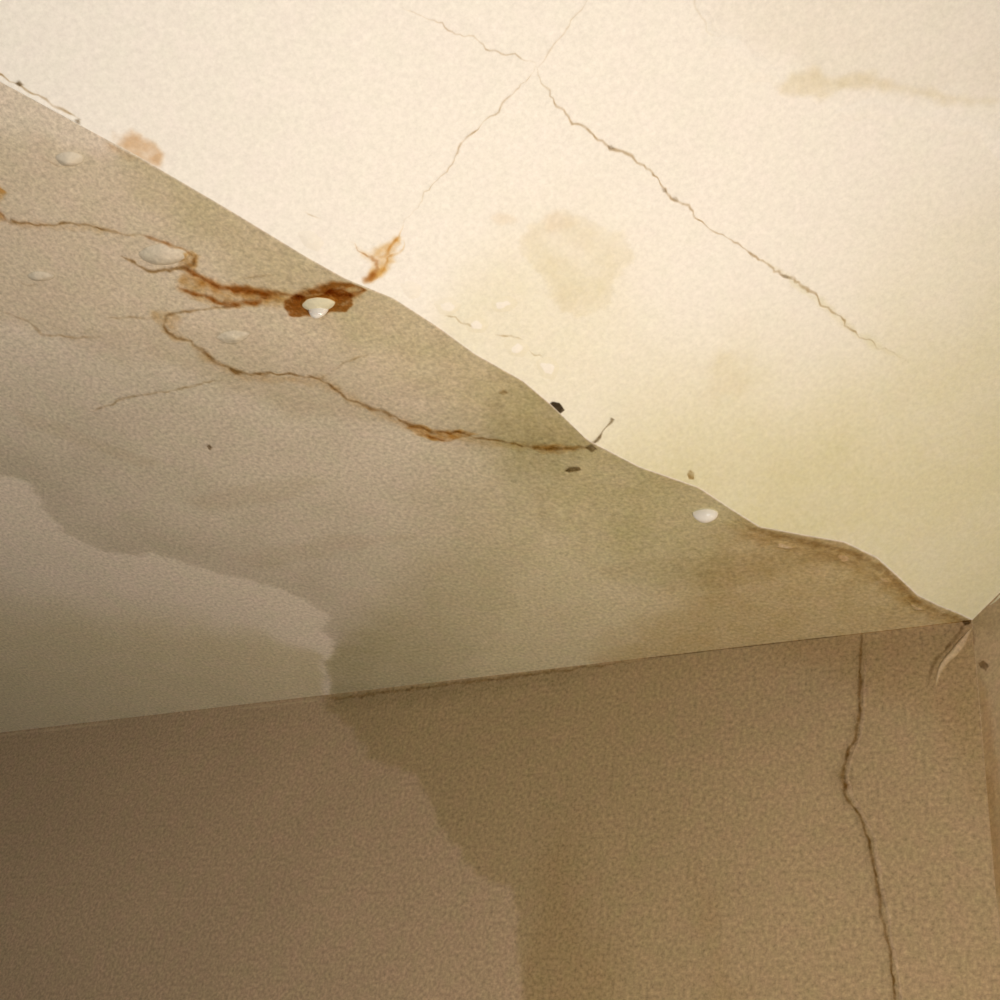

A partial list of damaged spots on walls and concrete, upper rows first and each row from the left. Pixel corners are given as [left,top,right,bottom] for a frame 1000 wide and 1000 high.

crack [187,273,269,306]
corrosion [285,290,352,317]
crack [296,283,365,298]